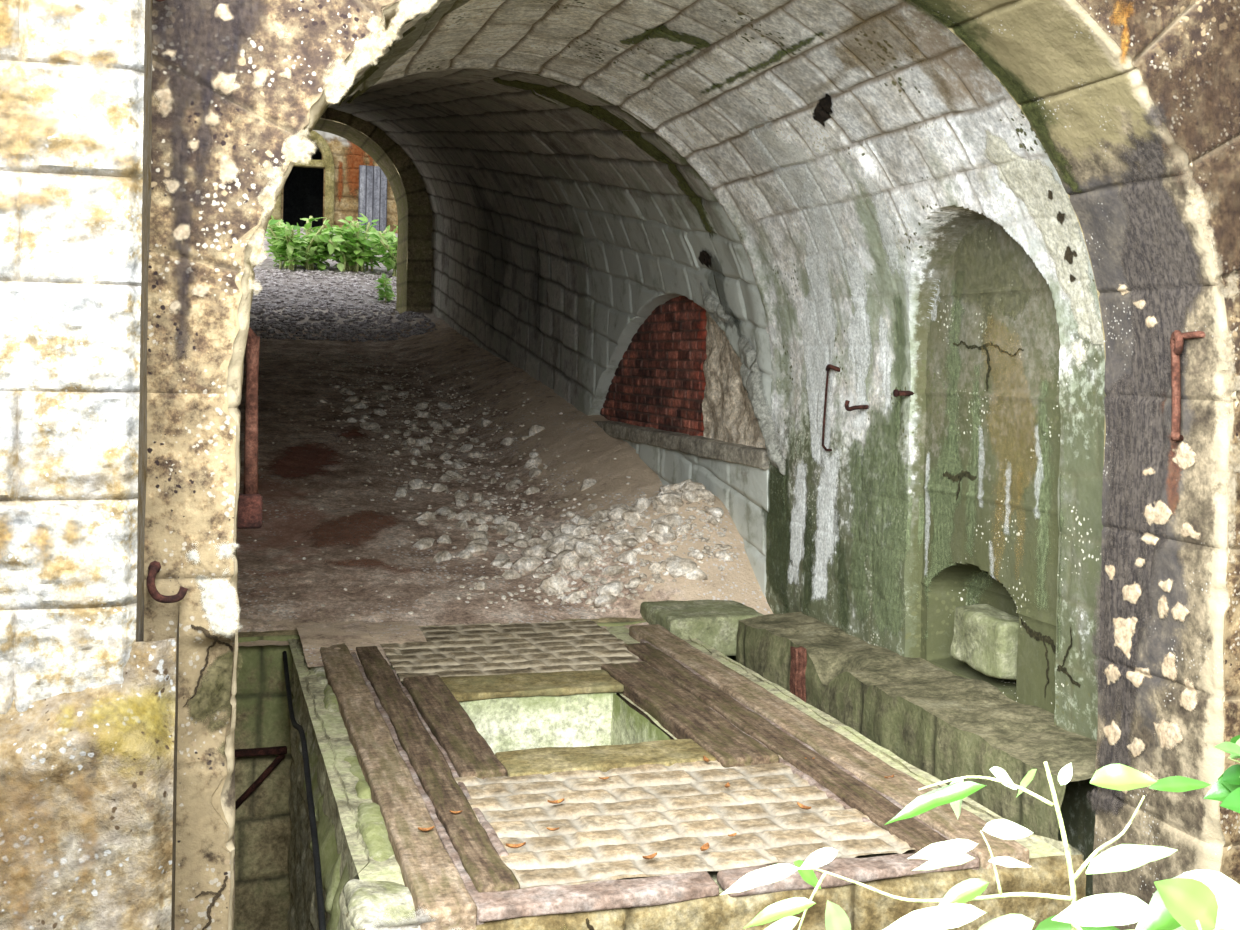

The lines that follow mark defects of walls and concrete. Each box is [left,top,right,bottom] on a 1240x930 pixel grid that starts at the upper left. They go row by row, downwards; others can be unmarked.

spalling [325,0,435,103]
spalling [282,130,314,162]
damp [152,0,263,358]
spalling [258,164,282,212]
spalling [251,228,266,263]
peeling [1118,285,1157,328]
peeling [1172,442,1196,470]
peeling [1141,501,1200,545]
peeling [1105,565,1198,711]
spalling [187,550,300,930]
peeling [1103,720,1145,757]
peeling [1154,719,1183,749]